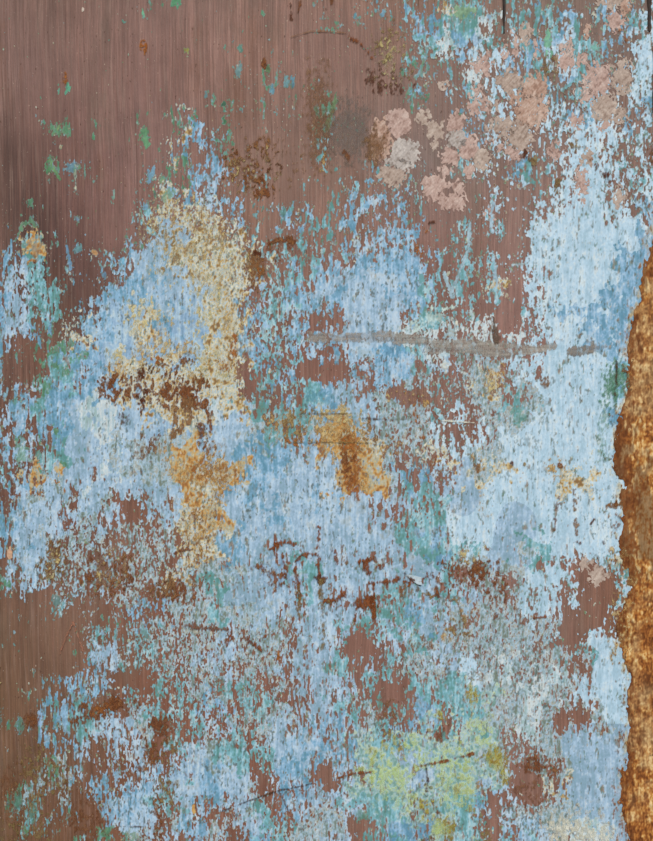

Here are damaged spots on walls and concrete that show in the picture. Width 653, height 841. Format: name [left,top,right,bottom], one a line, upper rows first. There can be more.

peeling [35,96,98,195]
peeling [128,109,151,154]
peeling [222,40,255,93]
peeling [251,61,301,136]
peeling [300,78,364,174]
peeling [65,232,93,286]
corrosion [97,196,296,610]
corrosion [264,403,380,501]
corrosion [603,241,653,841]
peeling [0,707,33,736]